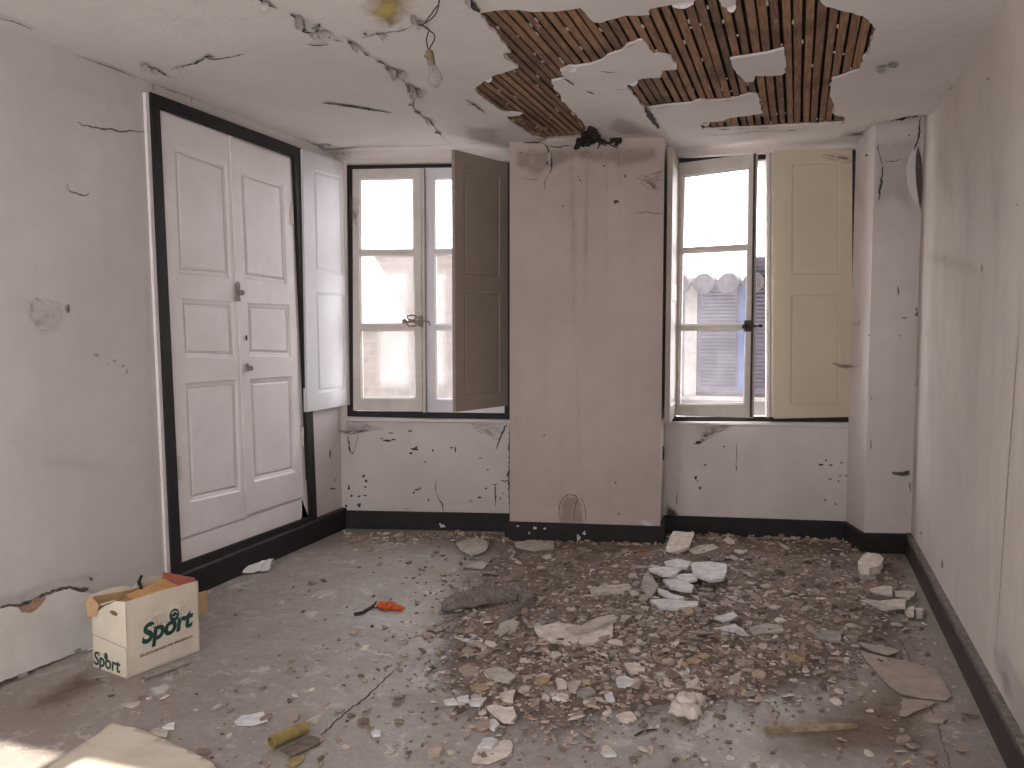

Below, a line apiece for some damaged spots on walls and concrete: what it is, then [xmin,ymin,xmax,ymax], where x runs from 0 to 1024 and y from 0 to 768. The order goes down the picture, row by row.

crack [259,0,447,146]
crack [307,141,378,152]
crack [523,142,571,190]
crack [877,148,900,200]
peeling [0,586,89,609]
crack [321,665,400,735]